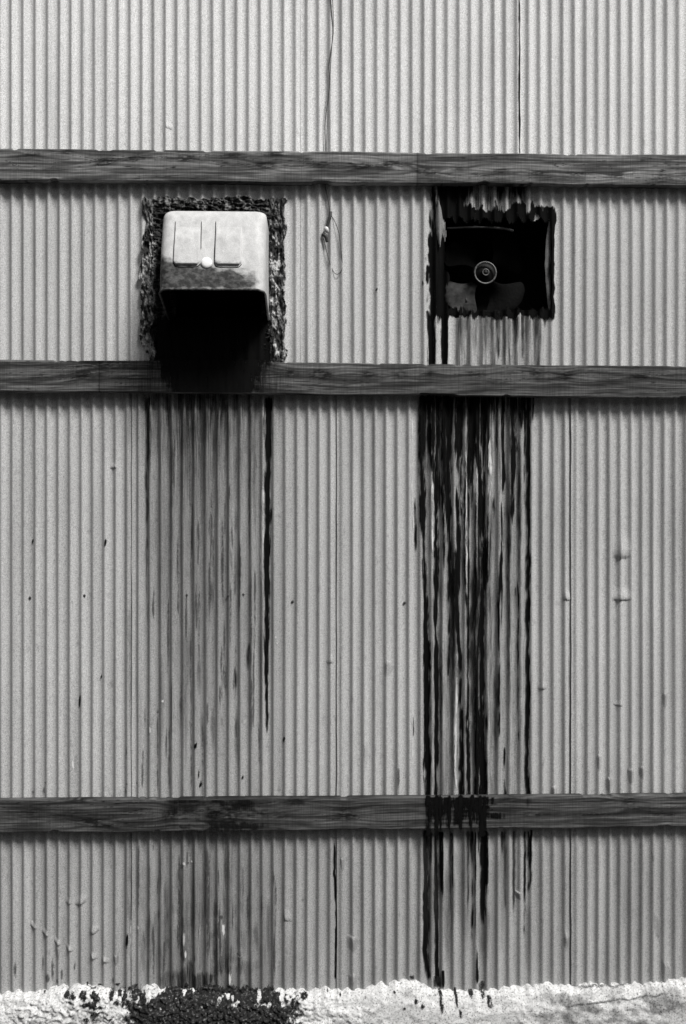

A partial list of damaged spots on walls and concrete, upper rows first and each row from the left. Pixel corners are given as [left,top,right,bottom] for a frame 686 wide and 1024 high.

water stain [427,314,448,365]
water stain [513,302,553,354]
water stain [145,394,273,785]
water stain [413,396,534,988]
water stain [194,800,264,832]